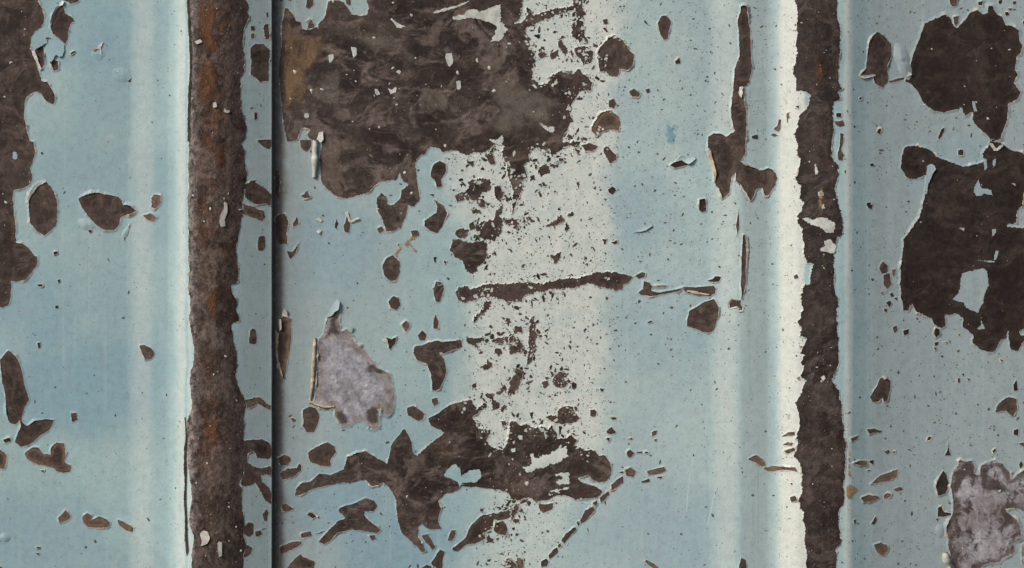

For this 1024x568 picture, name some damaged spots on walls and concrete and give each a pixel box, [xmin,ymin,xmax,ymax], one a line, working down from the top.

peeling [0,0,81,309]
peeling [76,189,163,233]
rust [184,0,251,568]
peeling [240,0,667,568]
peeling [685,275,722,335]
peeling [750,104,800,141]
peeling [859,0,1024,364]
peeling [0,348,73,474]
peeling [933,379,1024,568]